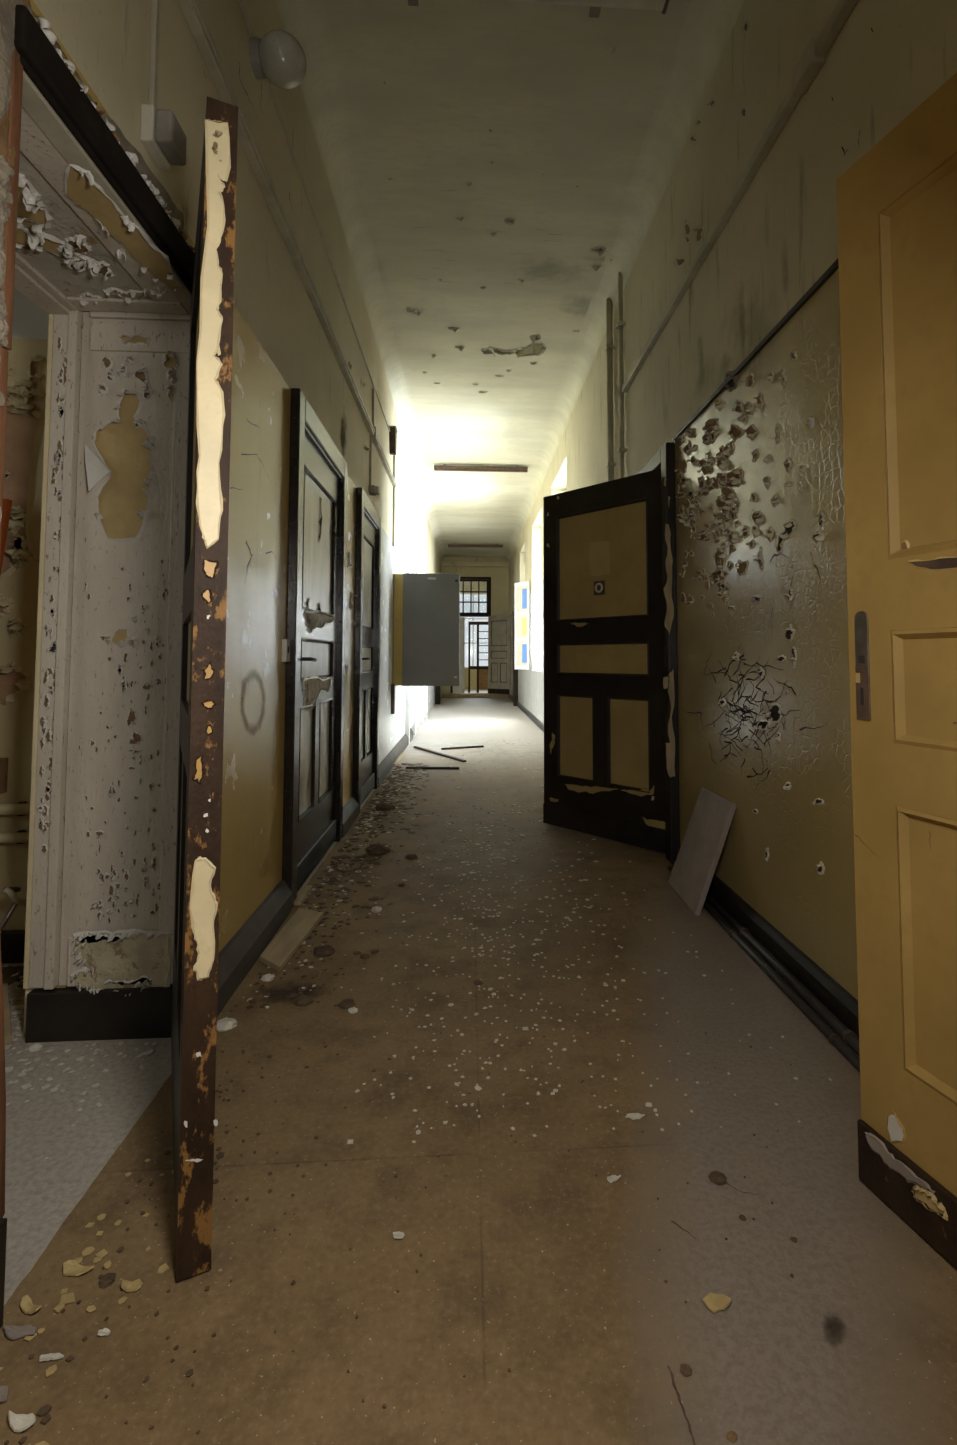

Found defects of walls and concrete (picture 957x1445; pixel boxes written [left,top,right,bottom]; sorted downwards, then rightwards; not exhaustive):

flaking render [0,0,195,254]
peeling [16,164,181,306]
peeling [448,327,546,393]
peeling [84,333,179,543]
peeling [0,337,69,855]
peeling [754,690,789,742]
peeling [756,623,797,679]